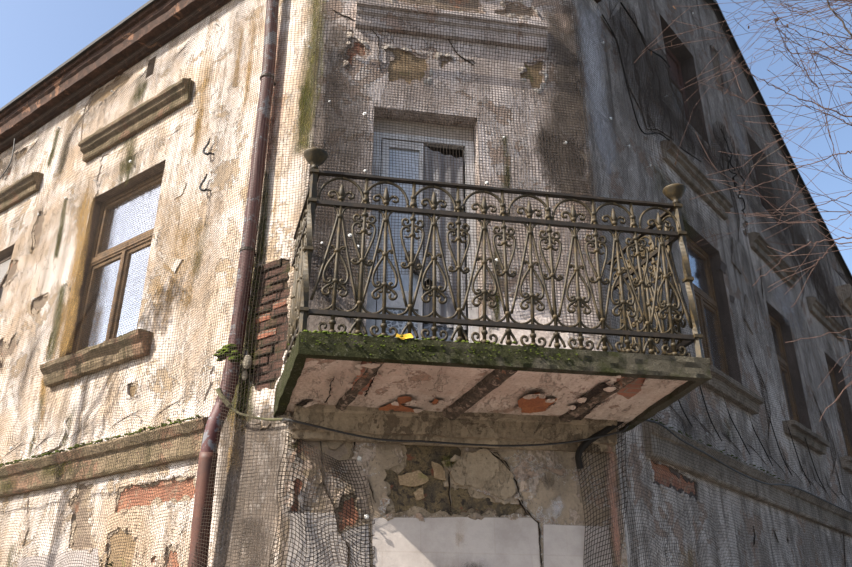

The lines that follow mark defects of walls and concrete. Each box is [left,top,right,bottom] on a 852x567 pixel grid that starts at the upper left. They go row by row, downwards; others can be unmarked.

flaking render [388,0,540,20]
flaking render [341,30,371,72]
flaking render [381,45,454,85]
flaking render [518,62,549,93]
water stain [307,27,363,329]
flaking render [245,259,294,390]
flaking render [515,392,557,413]
flaking render [566,376,651,420]
flaking render [66,472,196,567]
crack [446,469,454,515]
flaking render [381,444,529,522]
crack [478,447,542,567]